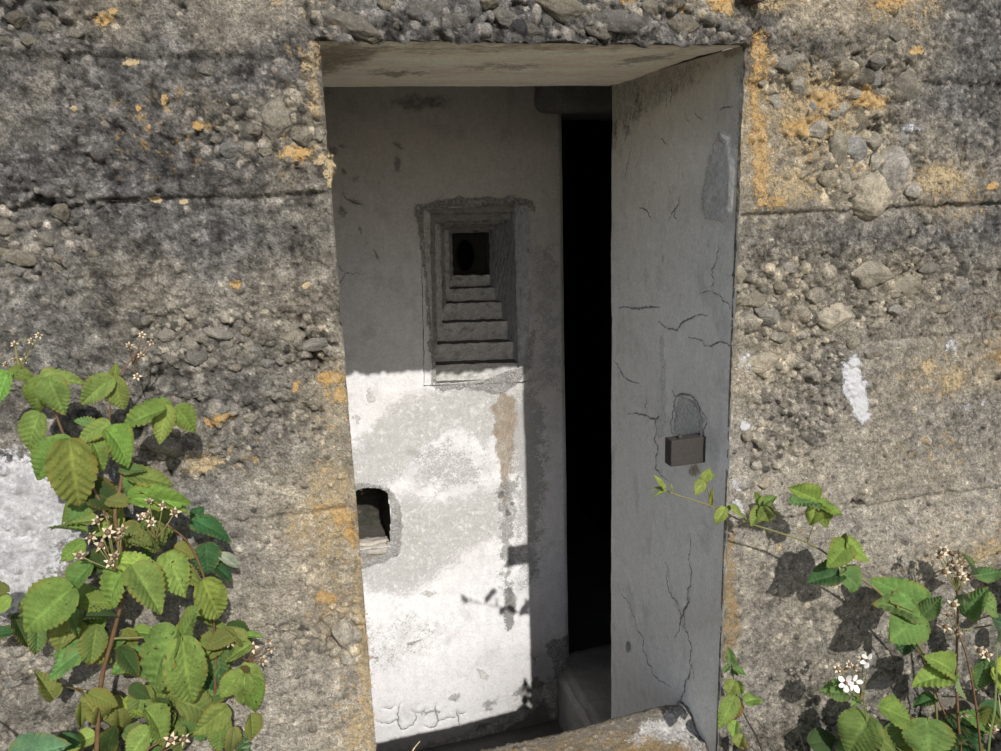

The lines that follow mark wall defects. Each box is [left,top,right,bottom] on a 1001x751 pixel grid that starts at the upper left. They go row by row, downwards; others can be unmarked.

water stain [496,475,520,623]
crack [619,534,694,704]
crack [377,706,462,730]